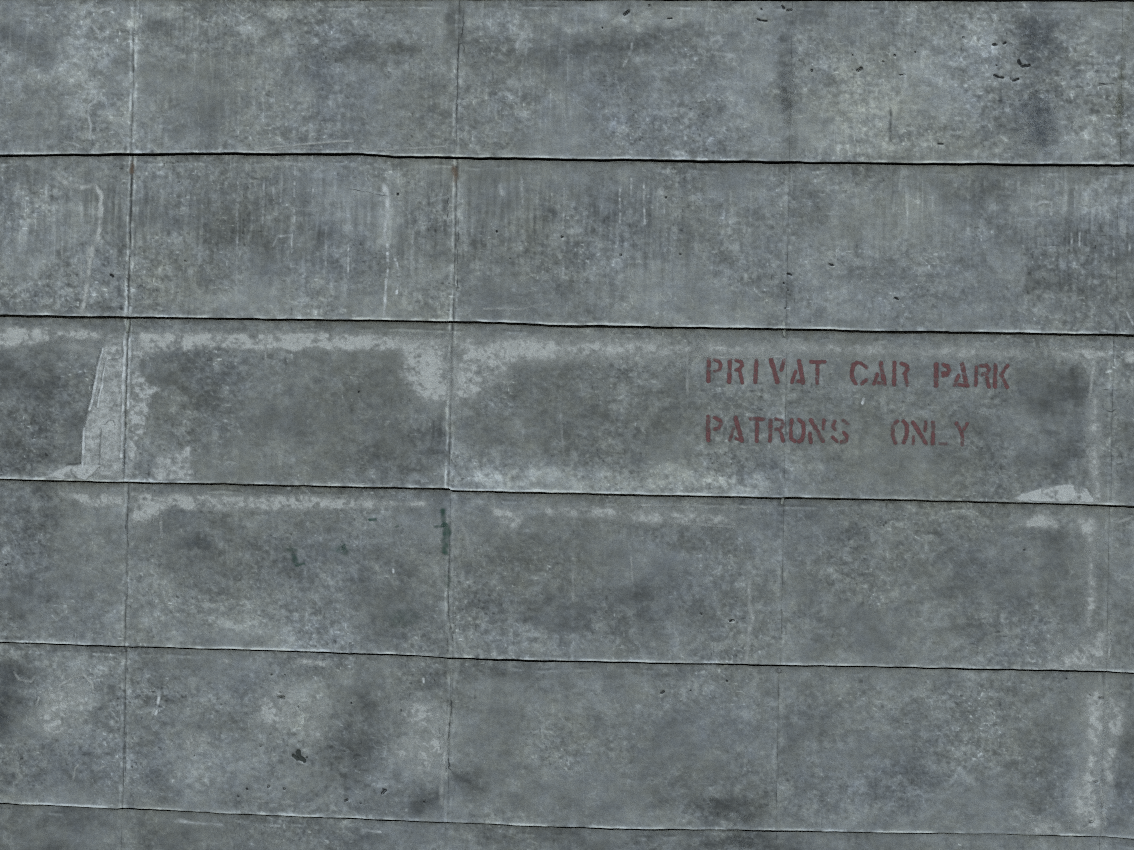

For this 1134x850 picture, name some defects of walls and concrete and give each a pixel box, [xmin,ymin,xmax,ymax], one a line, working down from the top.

water stain [57,174,104,314]
water stain [382,184,398,315]
water stain [0,326,107,411]
water stain [120,331,1020,458]